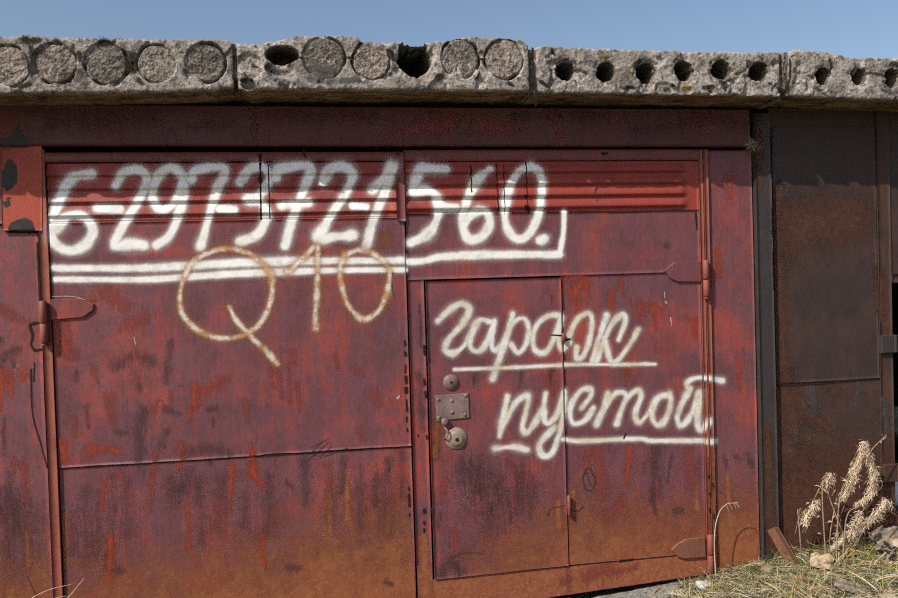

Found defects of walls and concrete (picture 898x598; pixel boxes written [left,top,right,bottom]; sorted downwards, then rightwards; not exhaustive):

spalling [240,63,289,90]